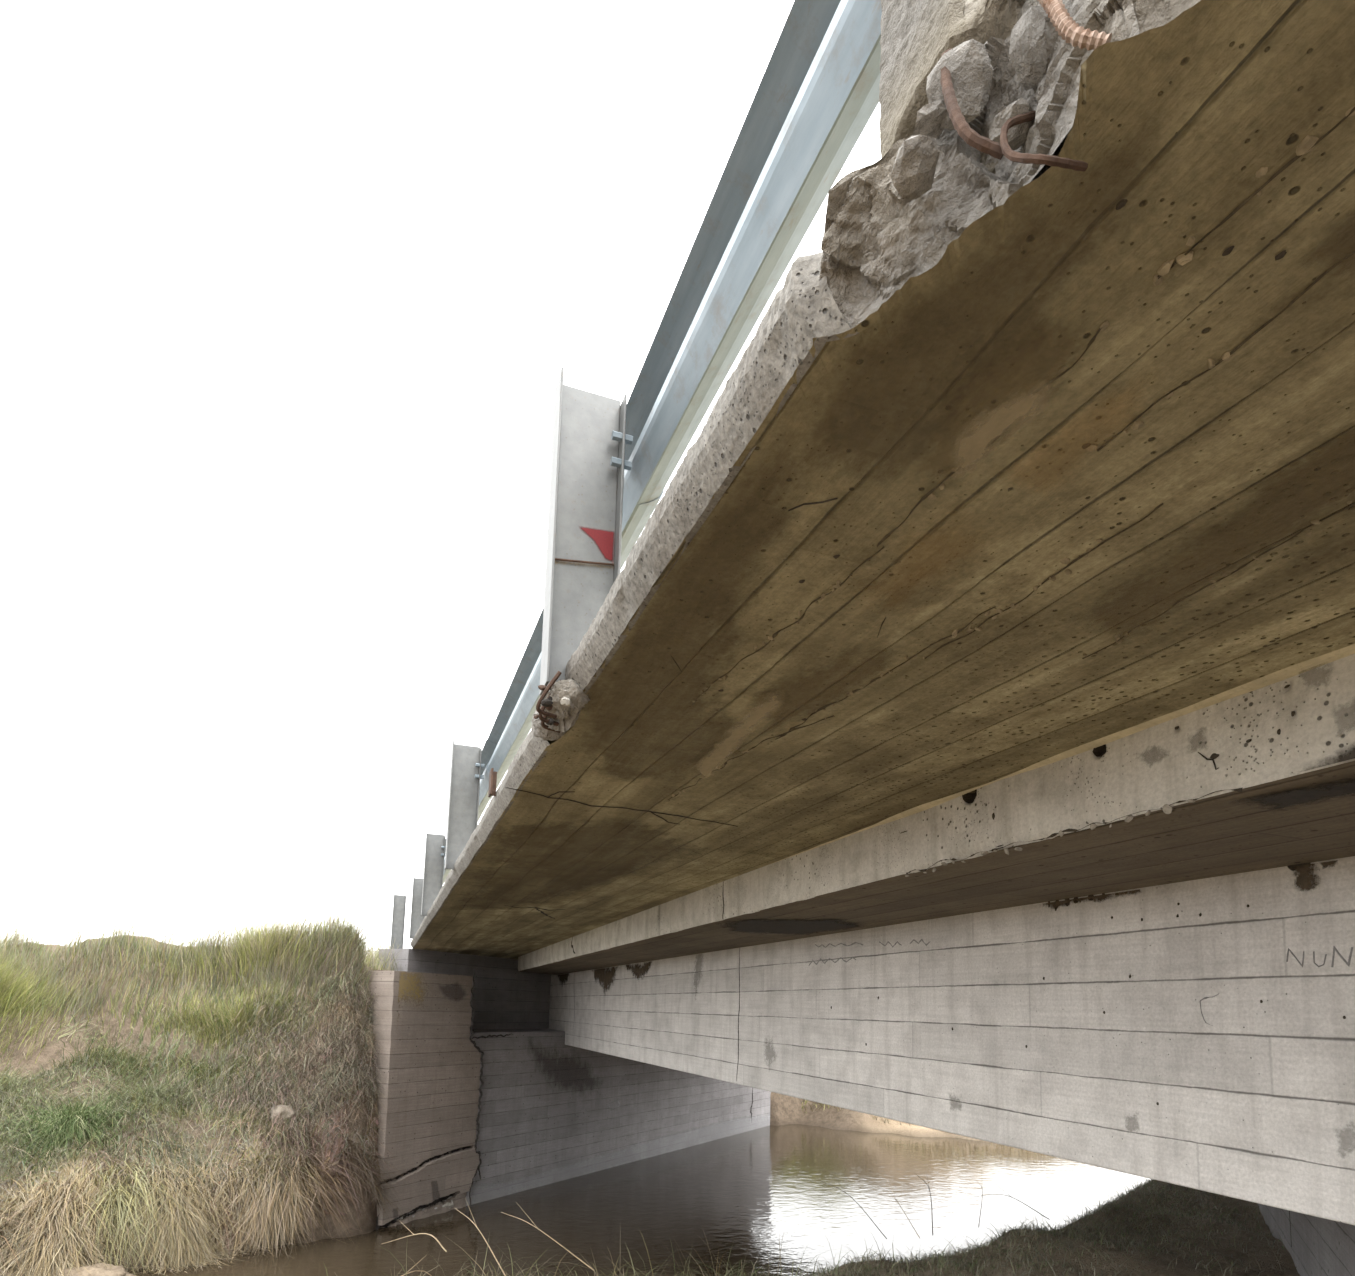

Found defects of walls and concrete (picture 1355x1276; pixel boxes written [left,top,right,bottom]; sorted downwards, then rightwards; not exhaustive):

spalling [820,0,1201,329]
spalling [531,671,591,741]
crack [374,970,514,1230]